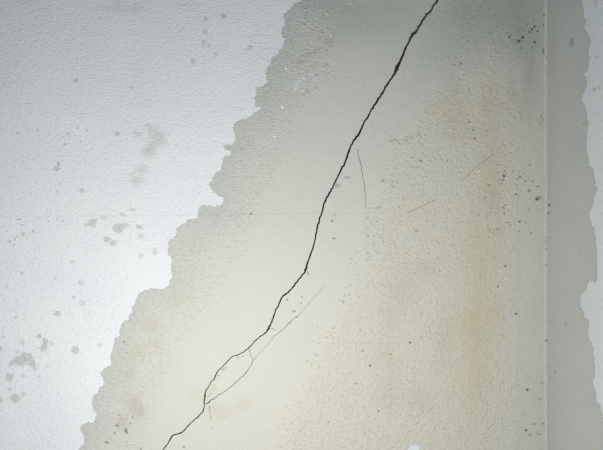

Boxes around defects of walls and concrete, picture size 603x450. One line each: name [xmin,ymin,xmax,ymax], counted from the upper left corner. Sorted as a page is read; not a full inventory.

crack [163,0,438,450]